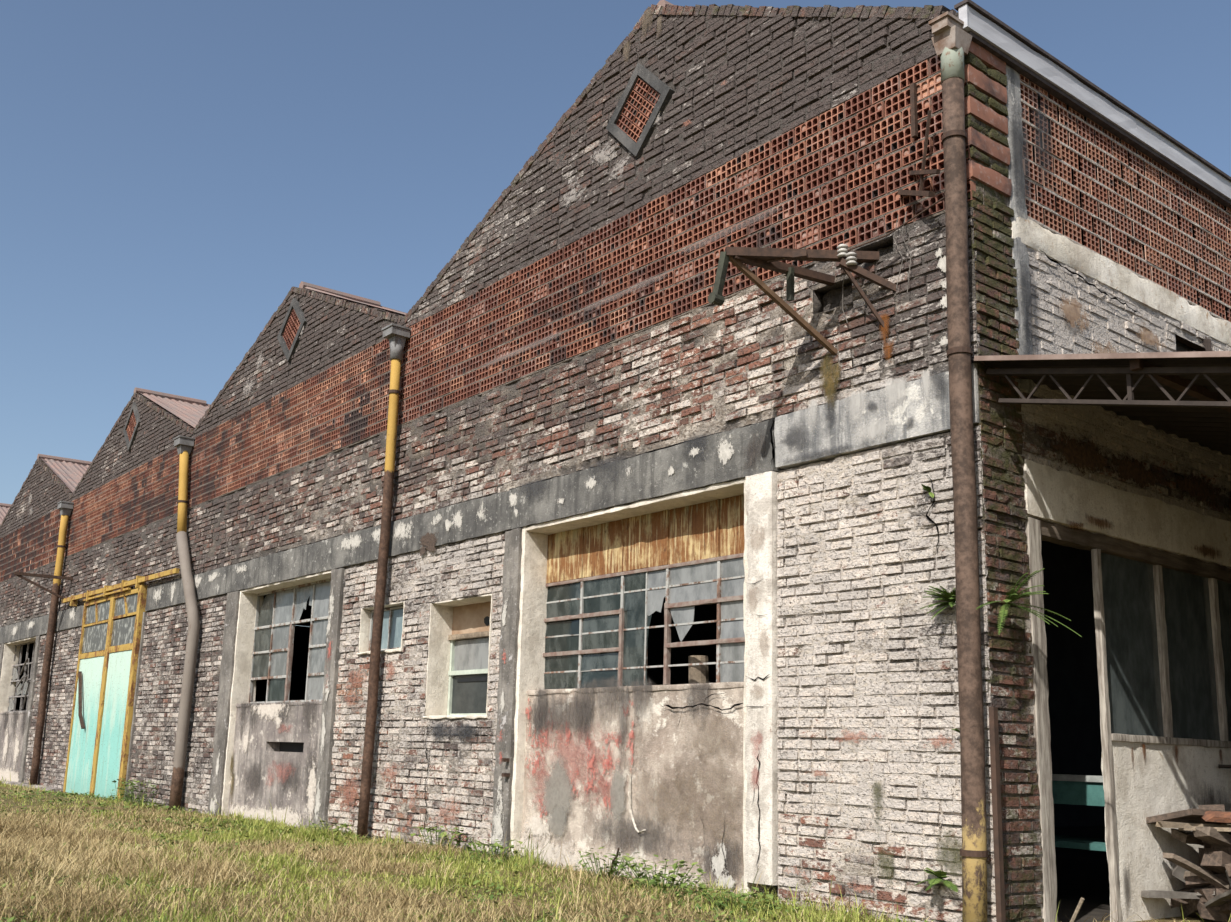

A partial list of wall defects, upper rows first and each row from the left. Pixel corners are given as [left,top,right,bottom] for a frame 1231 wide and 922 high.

rust [881,314,892,358]
water stain [785,378,906,462]
water stain [922,371,945,401]
water stain [532,679,651,742]
crack [662,675,769,730]
water stain [229,701,316,826]
spalling [524,698,646,837]
water stain [519,813,740,890]
crack [701,813,728,875]
crack [752,747,760,870]